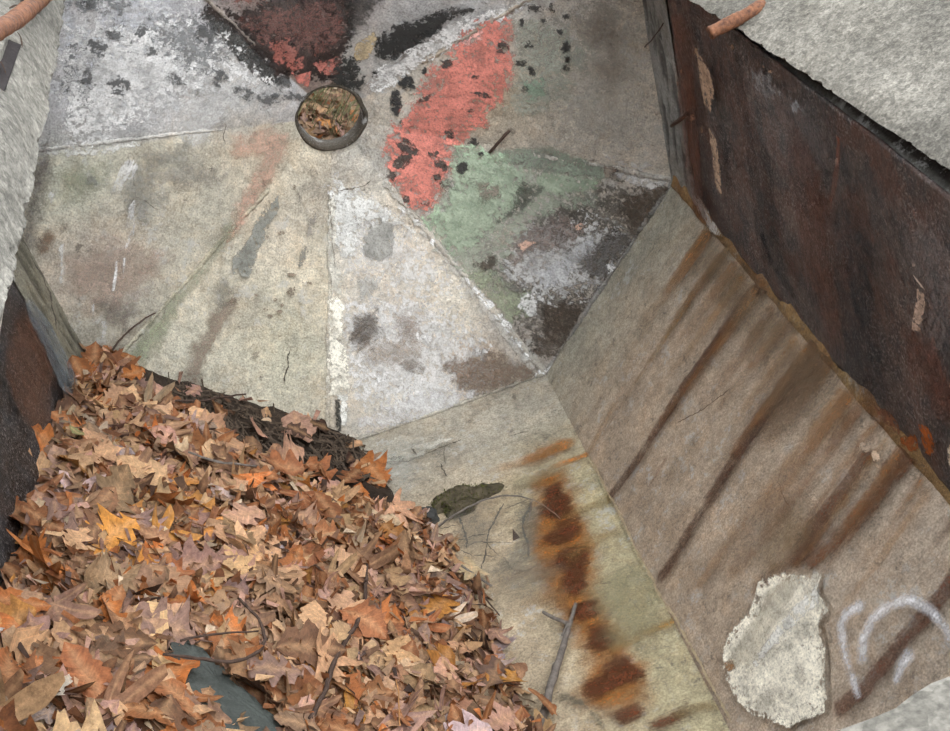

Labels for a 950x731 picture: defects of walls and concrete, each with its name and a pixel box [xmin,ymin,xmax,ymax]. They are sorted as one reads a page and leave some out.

spalling [0,0,52,41]
peeling [52,0,618,376]
corrosion [670,226,711,282]
peeling [694,47,714,112]
peeling [690,115,722,194]
corrosion [606,247,767,500]
corrosion [658,336,832,581]
corrosion [775,405,935,569]
corrosion [531,440,719,729]
corrosion [835,570,950,716]